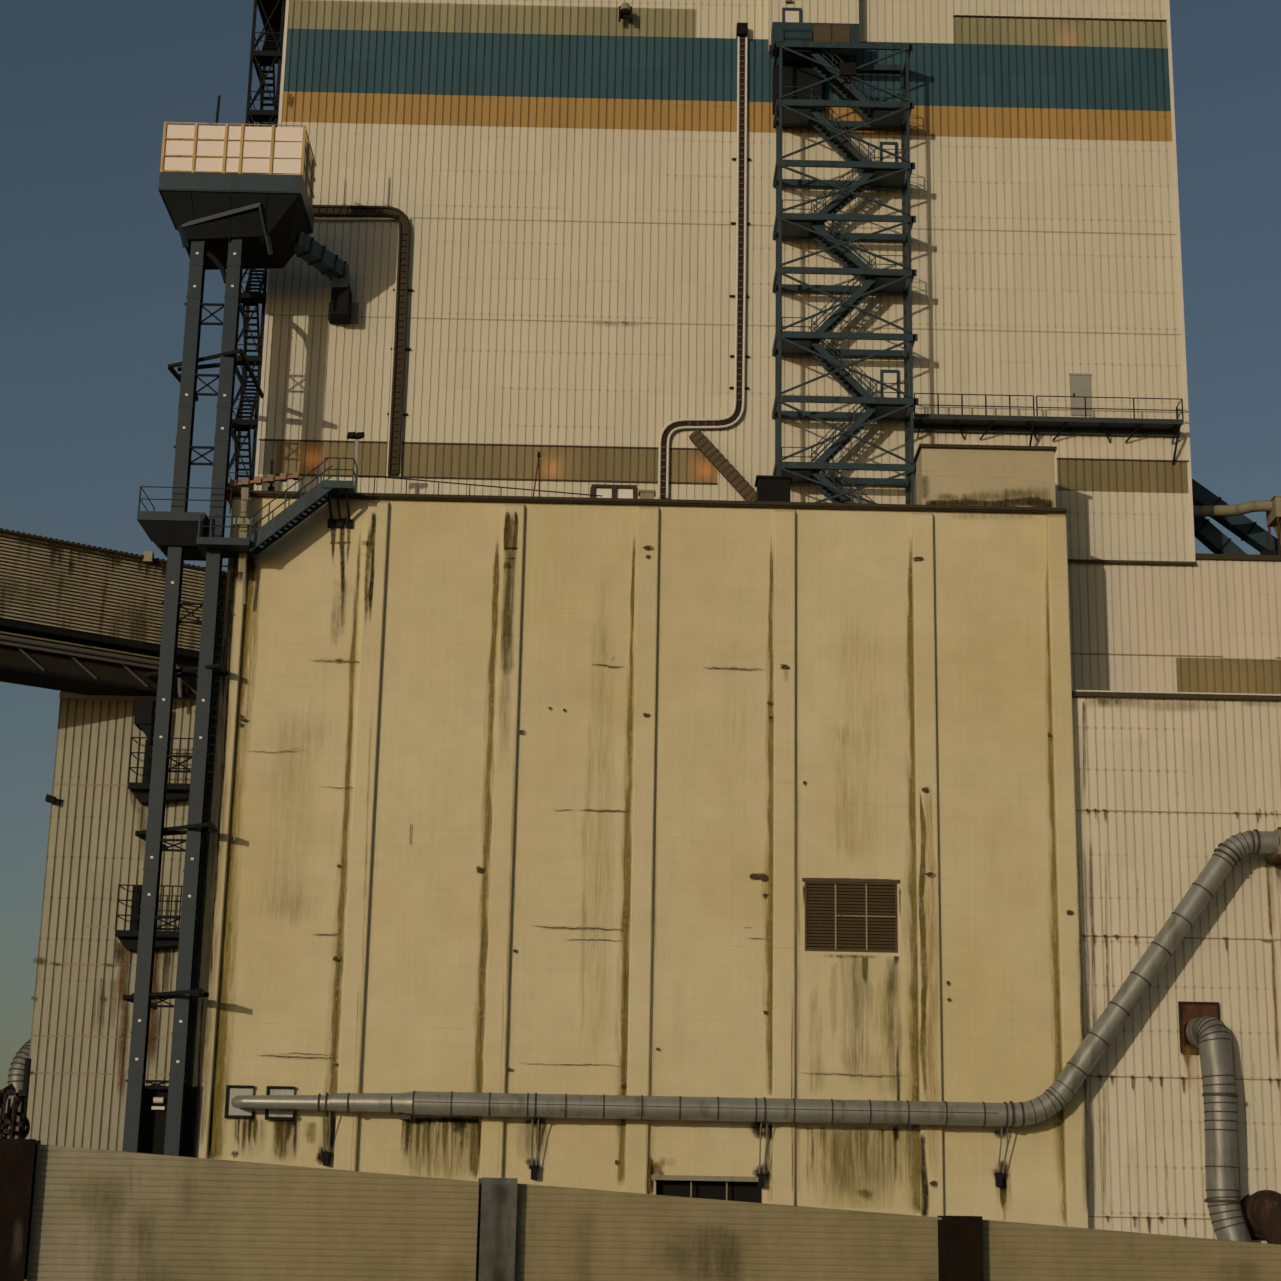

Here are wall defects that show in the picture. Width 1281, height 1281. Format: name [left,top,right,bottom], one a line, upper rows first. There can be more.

damp [198,560,336,1163]
damp [330,514,376,1094]
damp [401,1116,481,1175]
damp [476,512,518,1093]
damp [618,1119,626,1180]
damp [620,548,635,1095]
damp [830,955,868,1027]
damp [792,1125,928,1216]
damp [887,553,933,1101]
corrosion [1263,864,1280,1052]